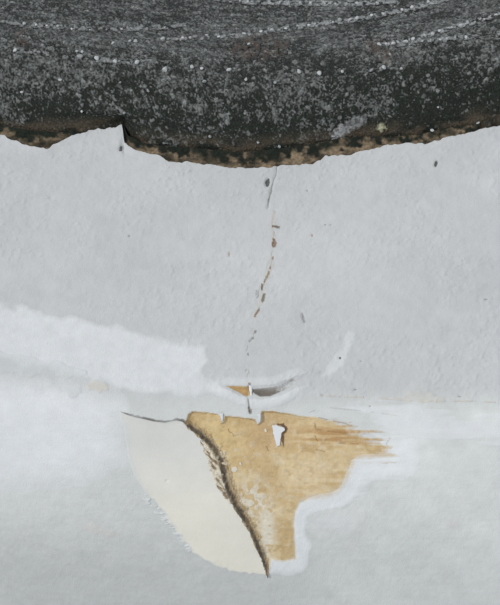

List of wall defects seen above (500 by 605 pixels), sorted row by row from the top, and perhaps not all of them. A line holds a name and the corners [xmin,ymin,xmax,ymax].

crack [245,166,280,414]
spalling [120,410,424,578]